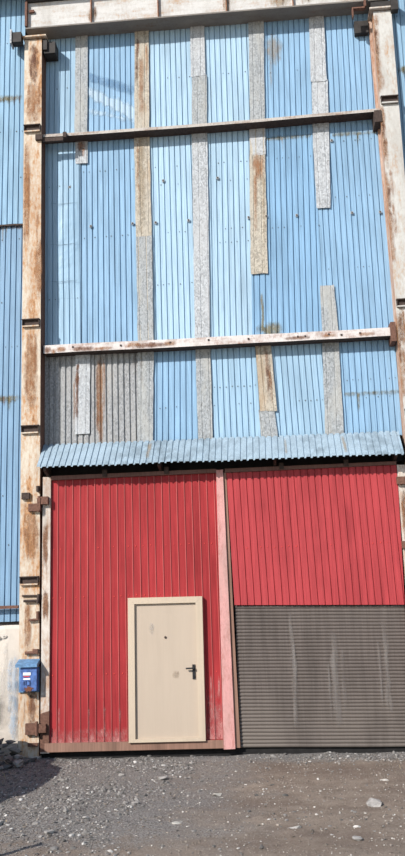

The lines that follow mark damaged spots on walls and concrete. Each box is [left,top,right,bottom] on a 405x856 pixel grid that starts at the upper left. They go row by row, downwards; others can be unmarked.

corrosion [0,47,40,115]
corrosion [372,19,381,89]
corrosion [24,150,38,232]
corrosion [253,156,265,211]
corrosion [384,174,396,259]
corrosion [96,364,105,434]